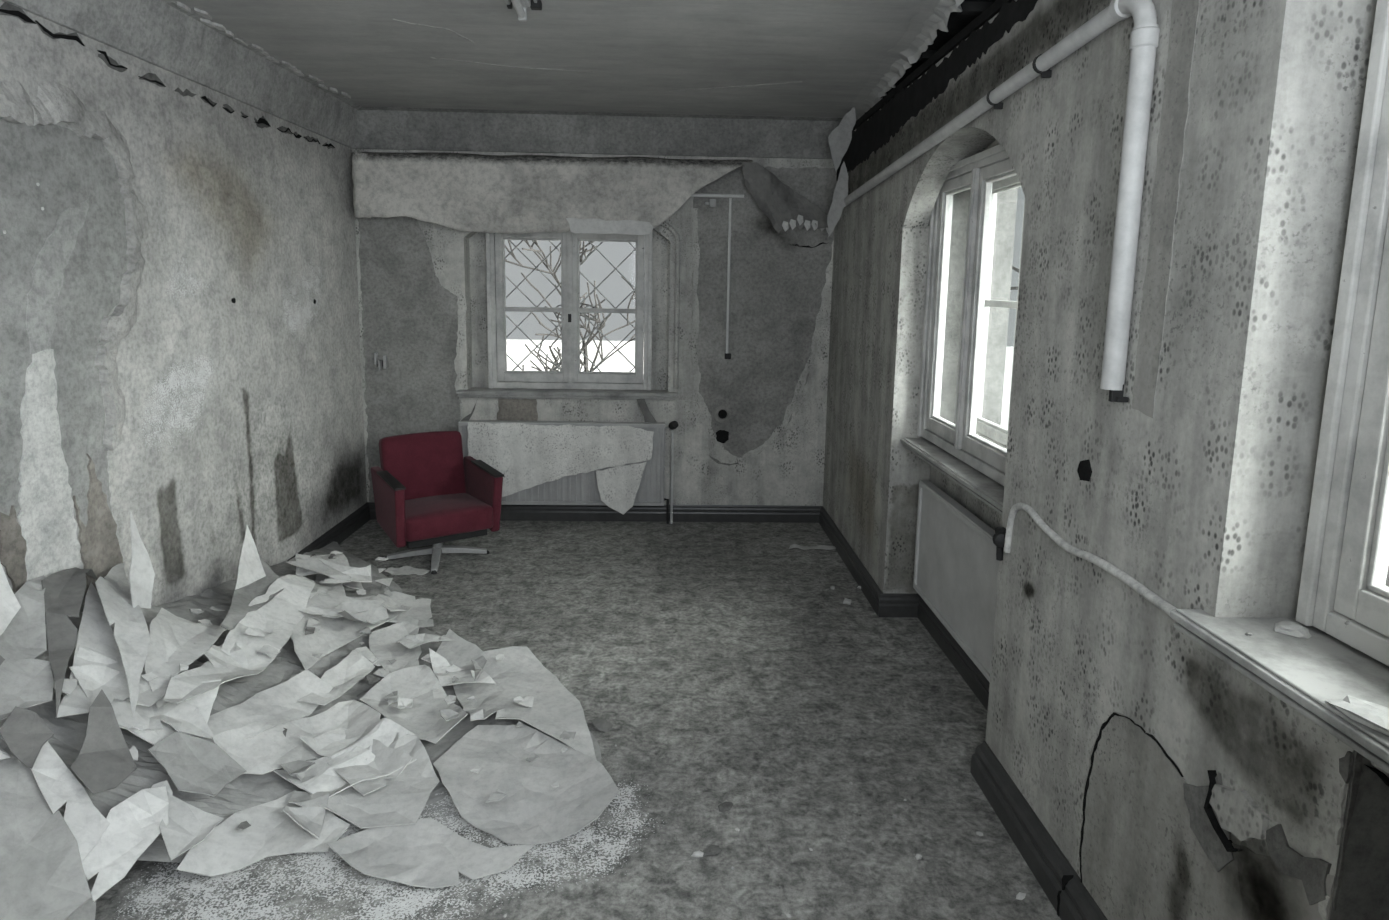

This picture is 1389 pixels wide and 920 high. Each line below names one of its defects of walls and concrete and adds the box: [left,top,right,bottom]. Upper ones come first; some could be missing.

crack [0,2,335,149]
peeling [0,80,150,612]
peeling [497,399,538,421]
peeling [691,166,836,466]
peeling [1079,712,1336,920]
spalling [1334,751,1353,845]